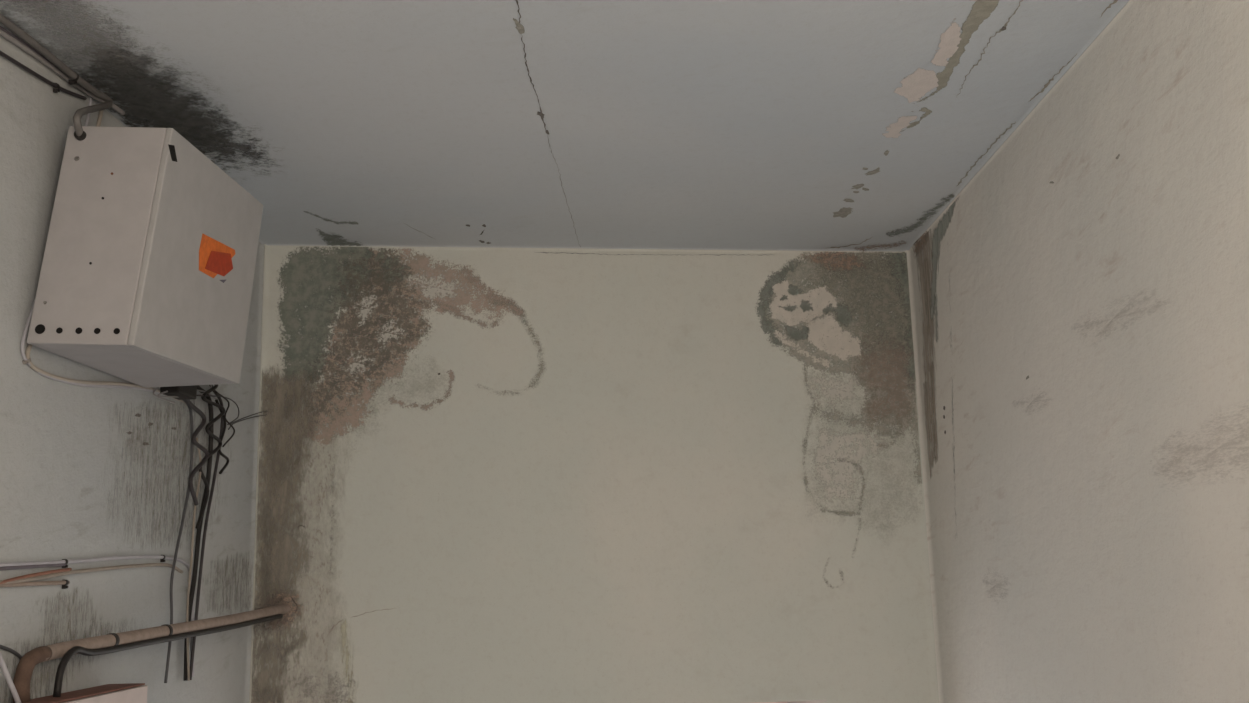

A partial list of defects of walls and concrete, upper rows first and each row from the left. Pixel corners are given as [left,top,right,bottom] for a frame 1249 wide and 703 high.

water stain [72,14,262,167]
crack [513,0,771,256]
peeling [833,0,999,218]
water stain [210,211,545,703]